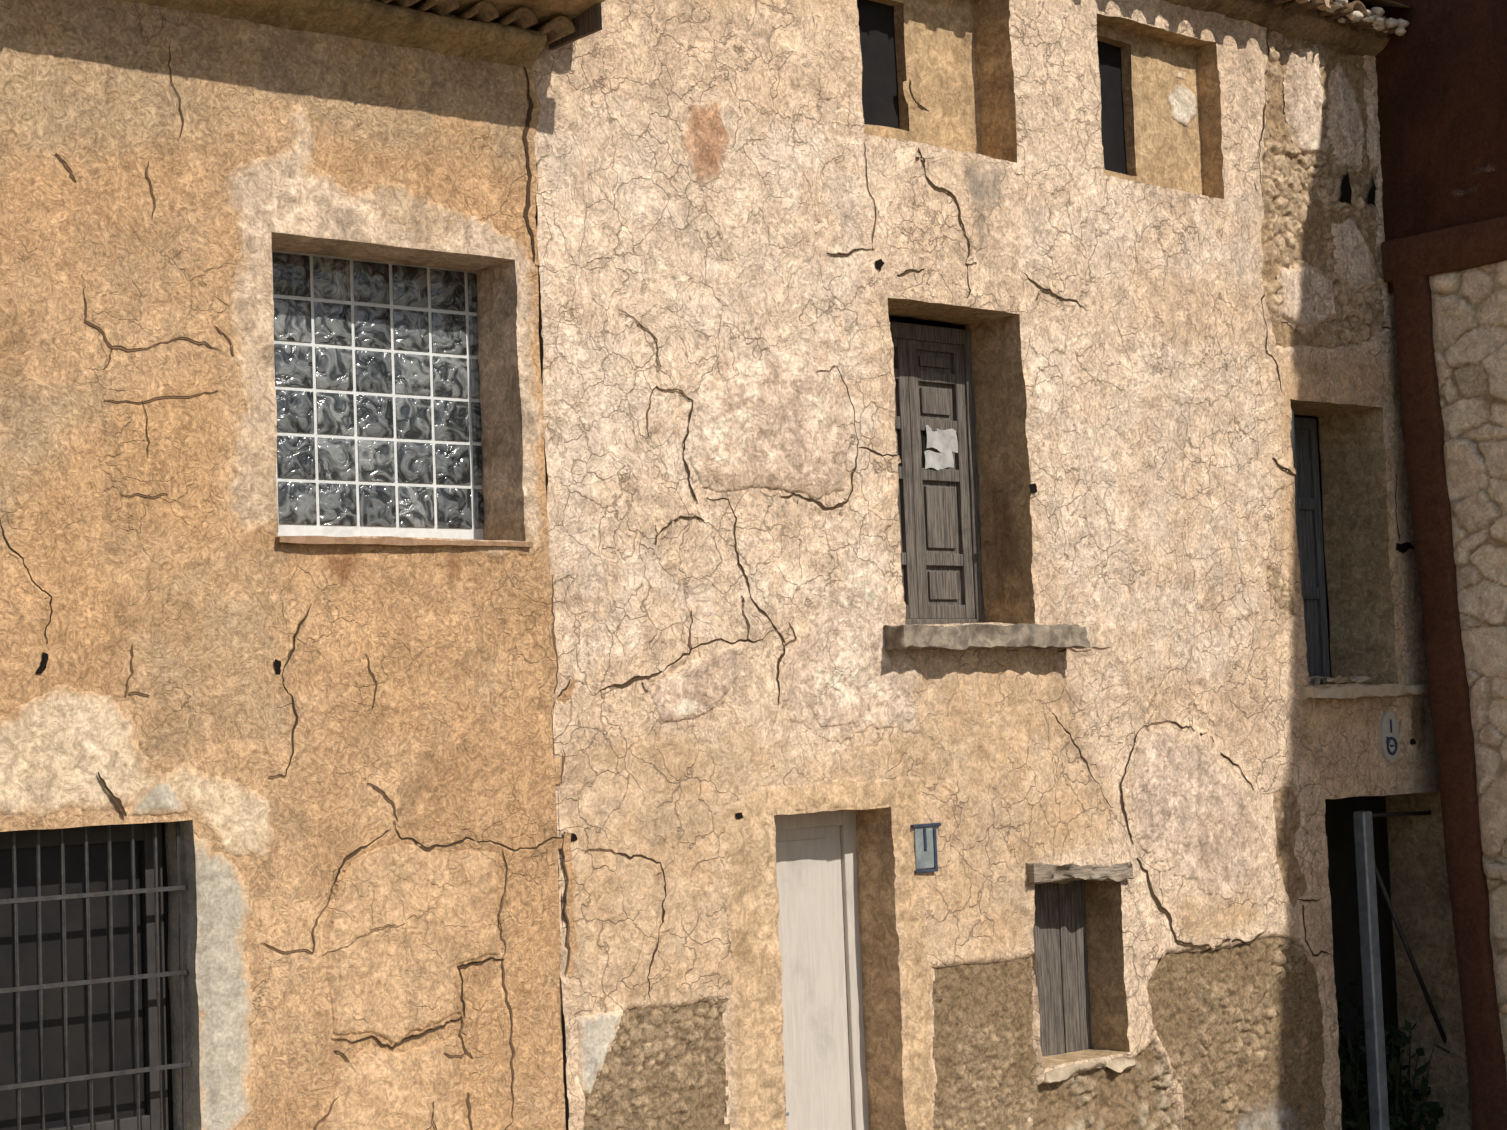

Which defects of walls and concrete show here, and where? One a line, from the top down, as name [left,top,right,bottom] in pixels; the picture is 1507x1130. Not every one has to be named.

spalling [1326,0,1409,36]
crack [523,66,541,266]
crack [826,80,977,298]
spalling [1261,31,1388,349]
crack [83,288,234,455]
crack [778,365,901,519]
crack [542,311,797,784]
crack [268,599,312,778]
crack [263,773,667,1130]
spalling [583,1000,730,1130]
spalling [932,937,1326,1130]
crack [1048,711,1331,1001]